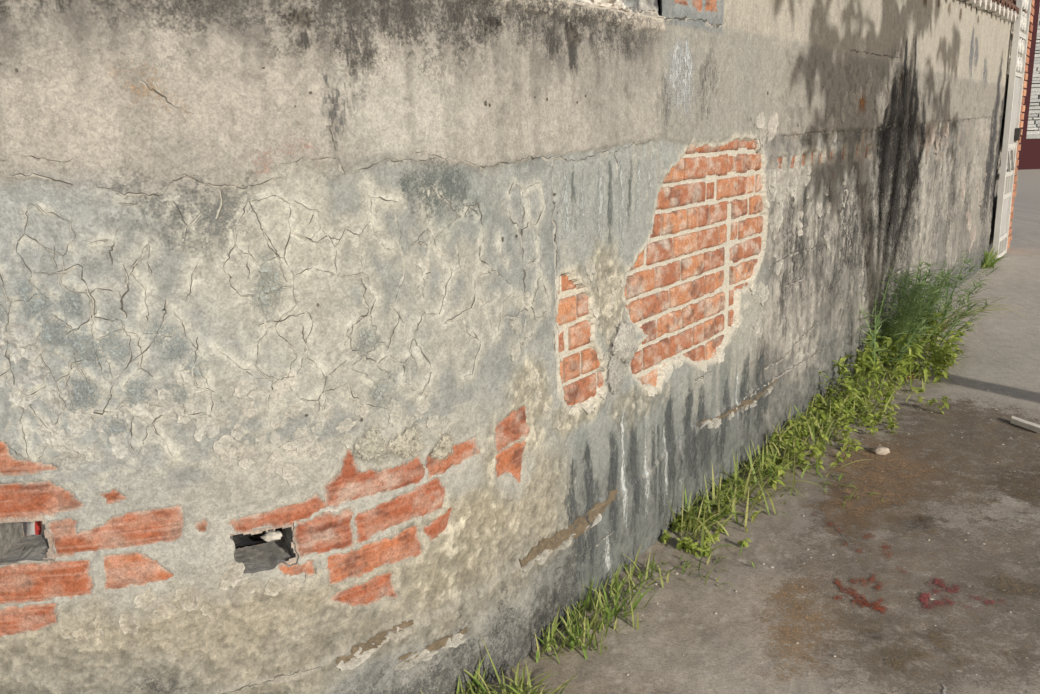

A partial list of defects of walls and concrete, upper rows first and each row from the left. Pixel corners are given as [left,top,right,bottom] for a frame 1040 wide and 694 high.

crack [0,108,659,459]
damp [128,0,651,69]
flaking render [495,68,889,483]
damp [781,39,926,304]
damp [969,27,1005,228]
flaking render [0,321,480,646]
spalling [517,489,618,578]
damp [370,348,768,694]